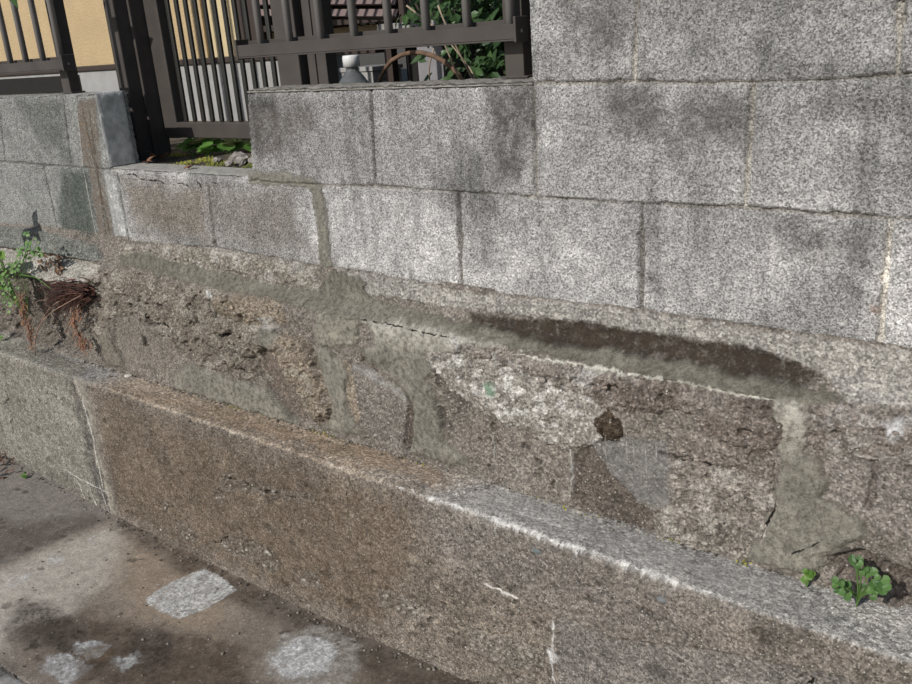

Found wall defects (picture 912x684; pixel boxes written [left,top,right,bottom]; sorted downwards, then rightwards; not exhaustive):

crack [341,318,447,337]